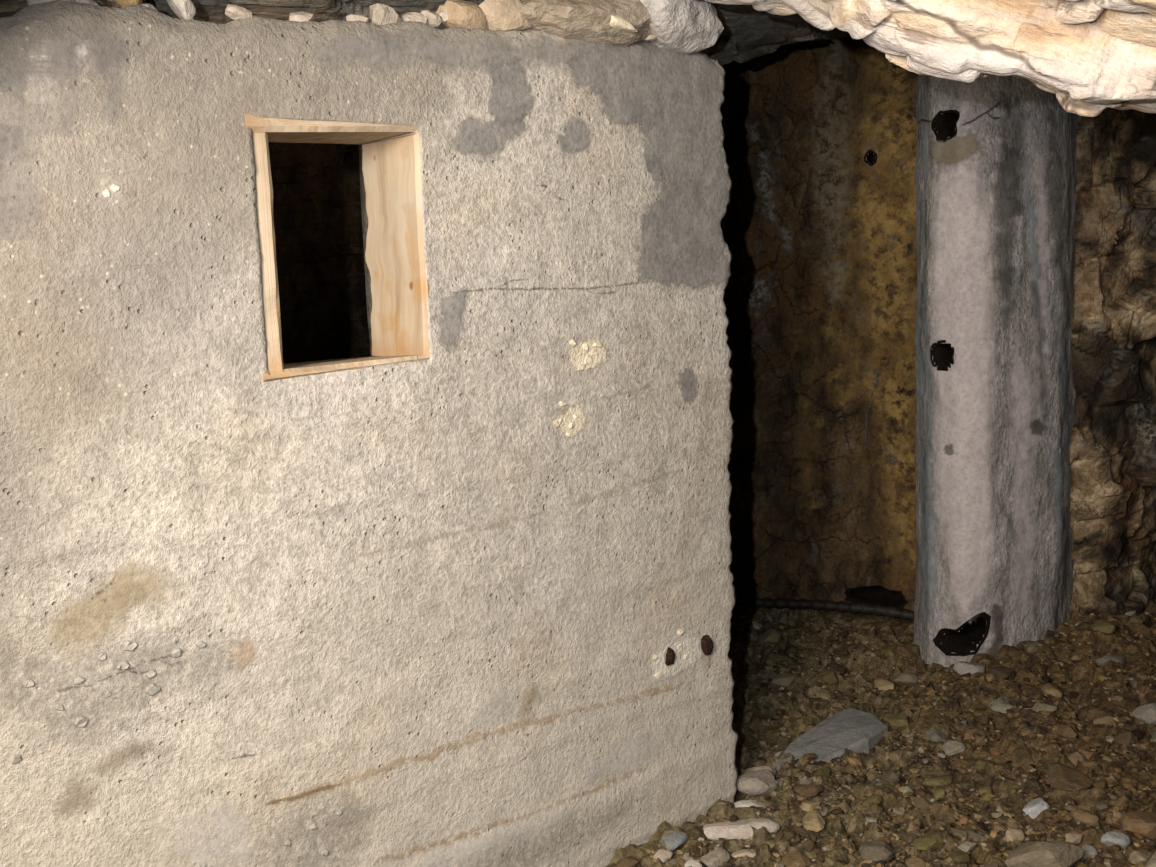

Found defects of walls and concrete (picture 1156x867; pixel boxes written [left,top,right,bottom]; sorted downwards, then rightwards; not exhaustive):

damp [455,61,533,155]
damp [558,119,591,152]
spalling [931,109,961,143]
damp [566,41,729,289]
crack [454,279,643,294]
spalling [930,340,956,372]
spalling [932,609,992,657]
corrosion [267,715,562,804]